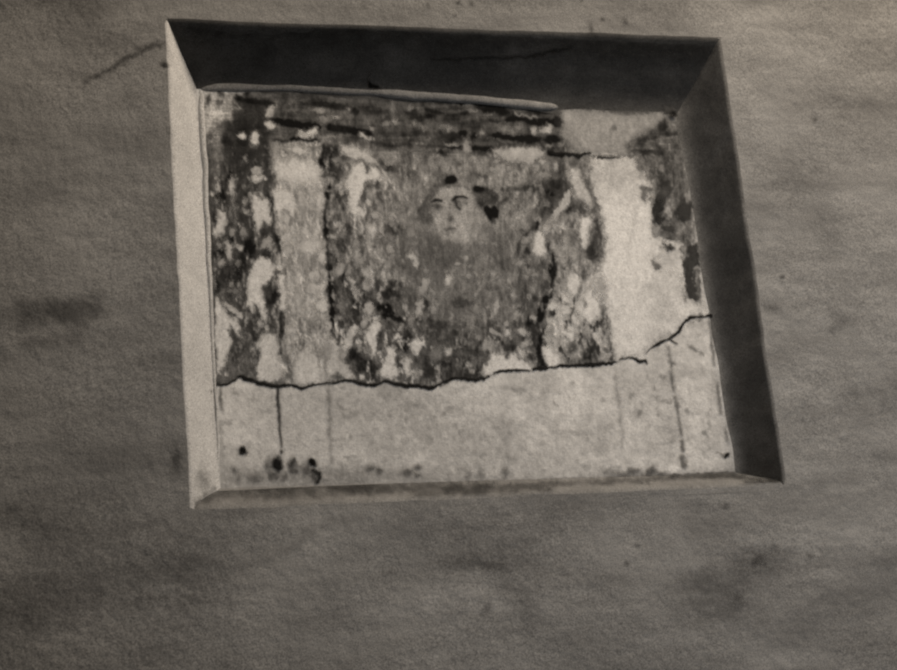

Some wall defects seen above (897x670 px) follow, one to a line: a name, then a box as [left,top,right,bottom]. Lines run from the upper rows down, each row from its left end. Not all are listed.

peeling [445,140,472,173]
peeling [497,111,552,135]
peeling [211,101,452,385]
peeling [444,256,502,315]
peeling [489,141,706,367]
crack [216,314,713,453]
peeling [482,320,533,375]
crack [672,379,687,467]